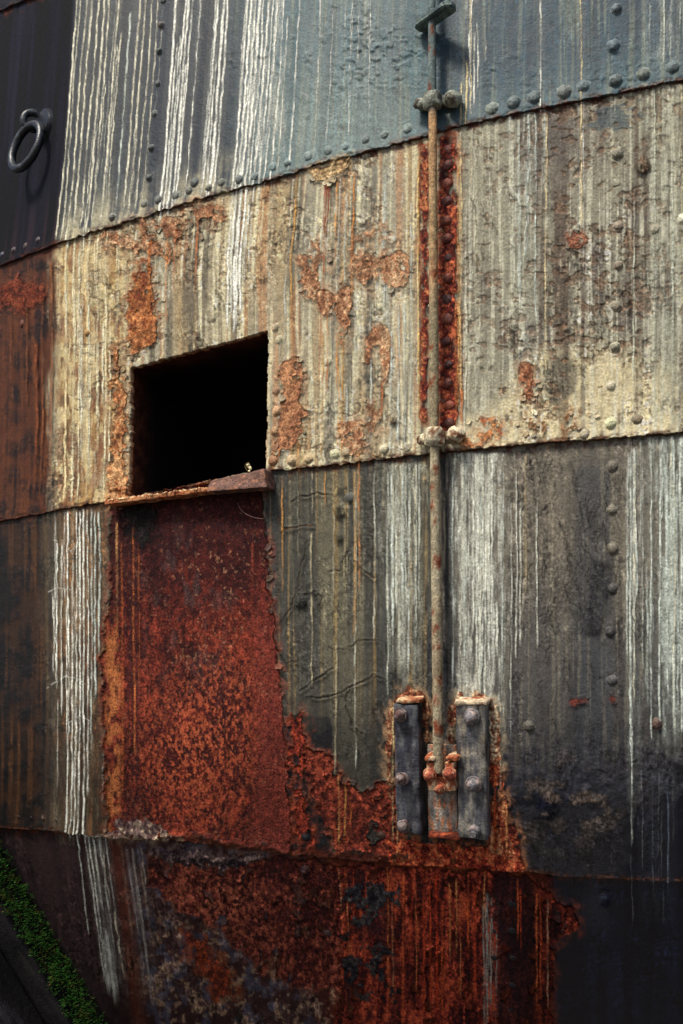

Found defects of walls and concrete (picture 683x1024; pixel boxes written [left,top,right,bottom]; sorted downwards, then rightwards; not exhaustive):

rust [0,263,53,477]
damp [158,0,197,218]
damp [203,0,228,196]
damp [226,0,300,328]
damp [336,178,355,293]
damp [389,168,419,448]
rust [417,134,504,447]
peeling [95,200,580,1024]
damp [626,437,683,789]
damp [53,510,121,998]
rust [384,683,525,874]